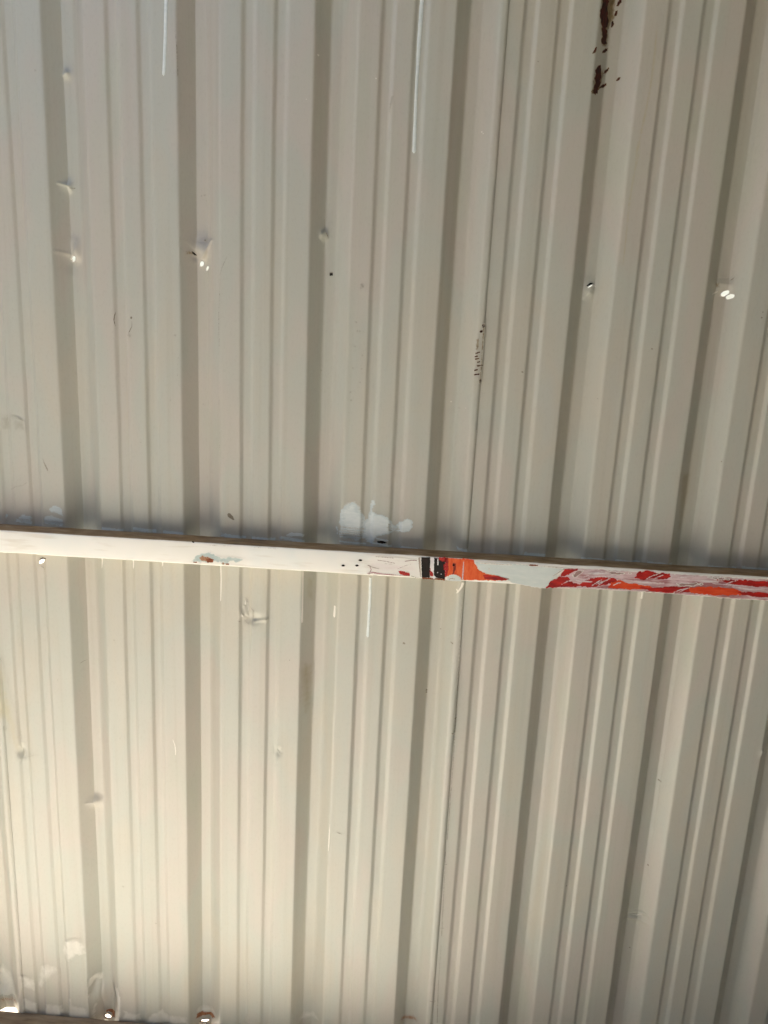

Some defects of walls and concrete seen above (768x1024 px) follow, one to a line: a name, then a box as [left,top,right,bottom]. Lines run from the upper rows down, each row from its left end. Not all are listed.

rust [590,0,622,95]
rust [474,323,485,384]